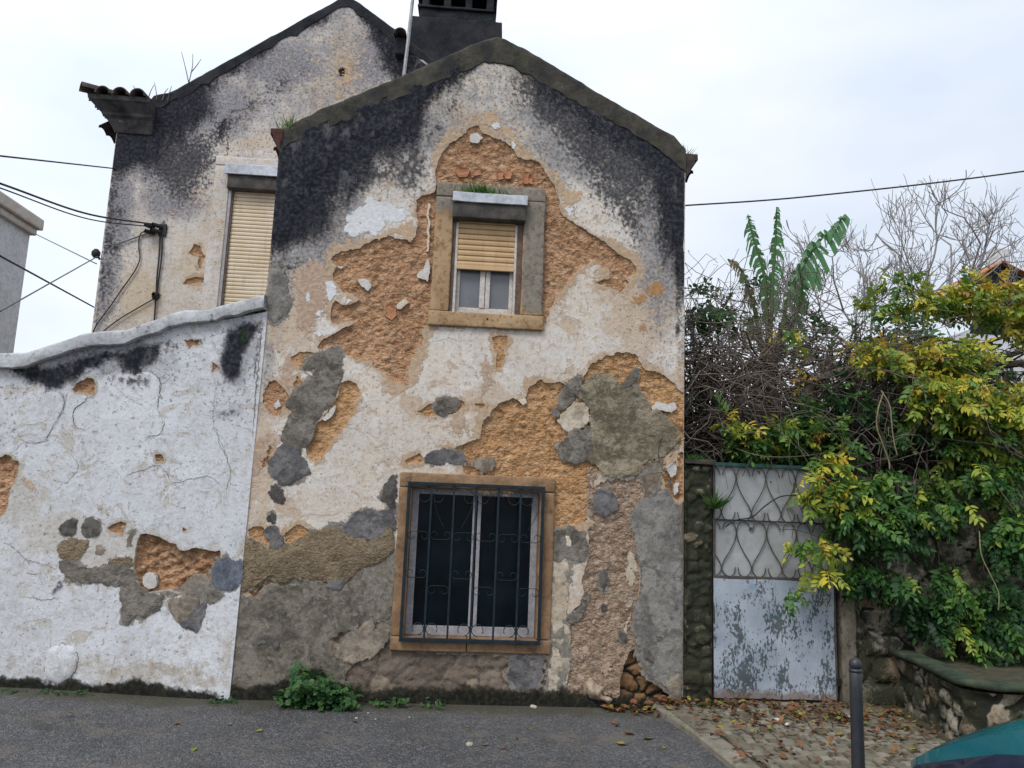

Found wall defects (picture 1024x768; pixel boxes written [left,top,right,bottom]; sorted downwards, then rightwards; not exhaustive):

leakage [269,16,476,273]
leakage [93,50,309,322]
leakage [510,74,684,310]
flaking render [183,242,205,288]
leakage [14,341,178,390]
crack [13,392,87,452]
crack [150,371,173,436]
crack [128,390,235,497]
flaking render [262,111,684,703]
flaking render [0,453,36,516]
crack [3,542,56,600]
flaking render [131,532,221,596]